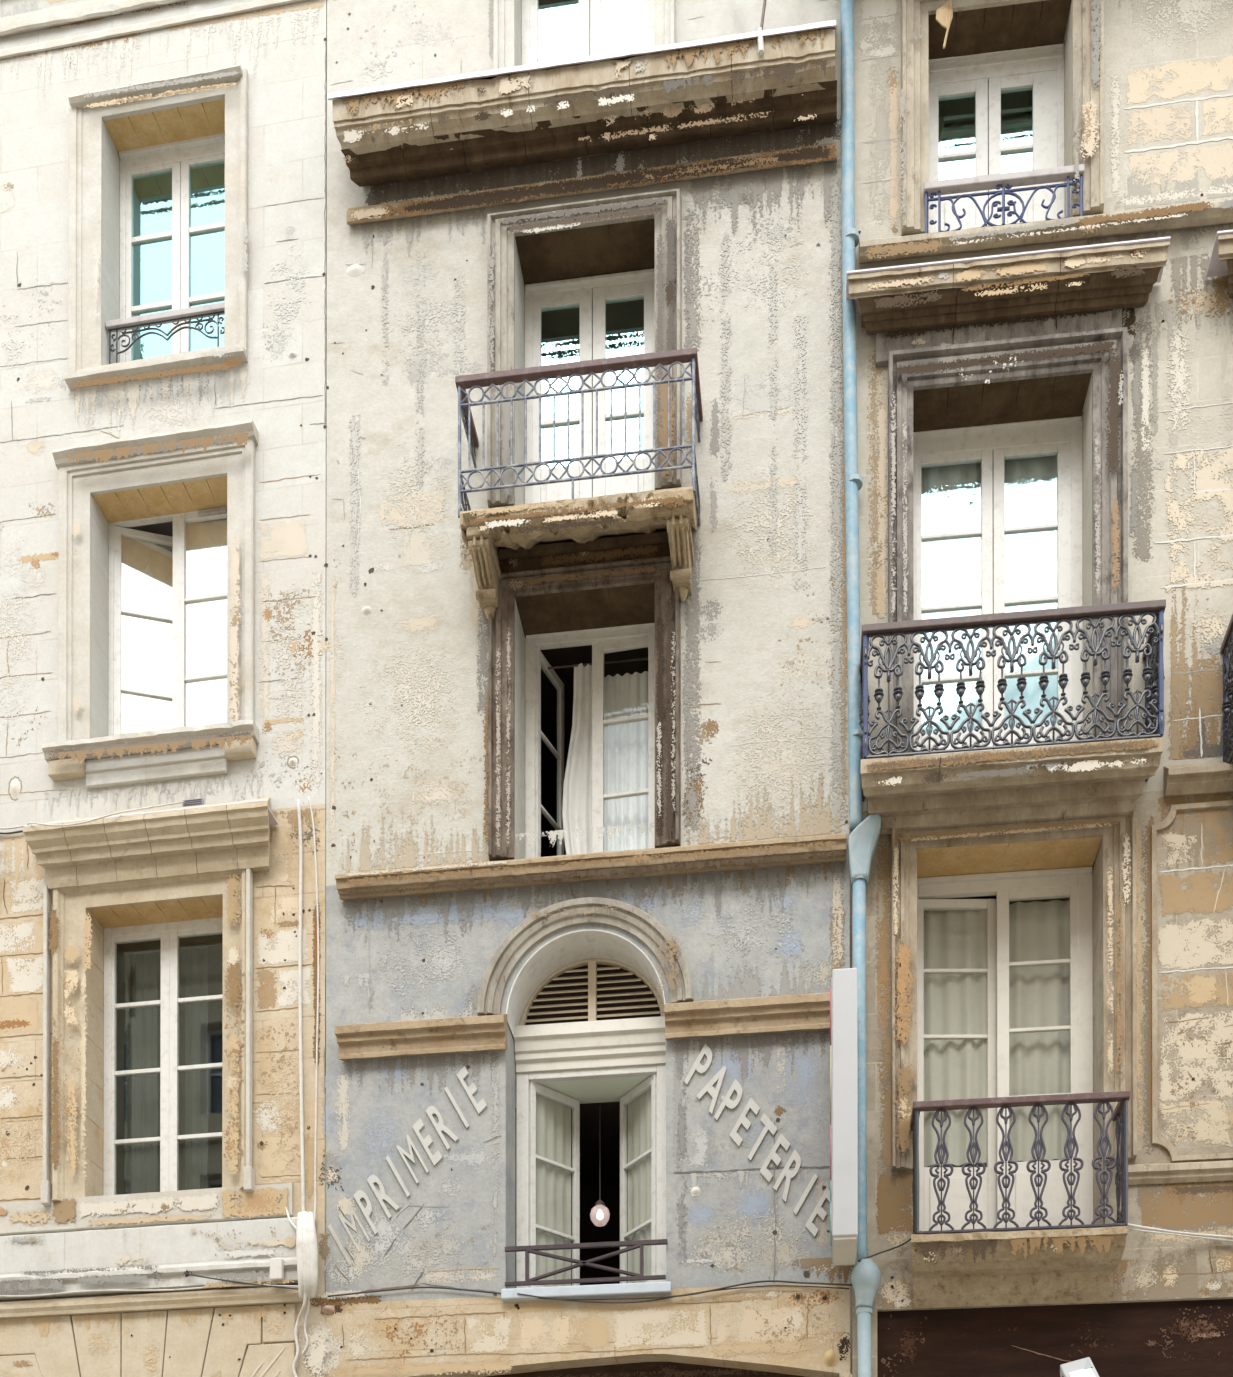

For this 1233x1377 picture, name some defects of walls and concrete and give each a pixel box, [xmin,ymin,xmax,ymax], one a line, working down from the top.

leakage [490,155,833,630]
leakage [343,862,845,997]
spalling [374,1303,467,1356]
peeling [538,1293,831,1377]